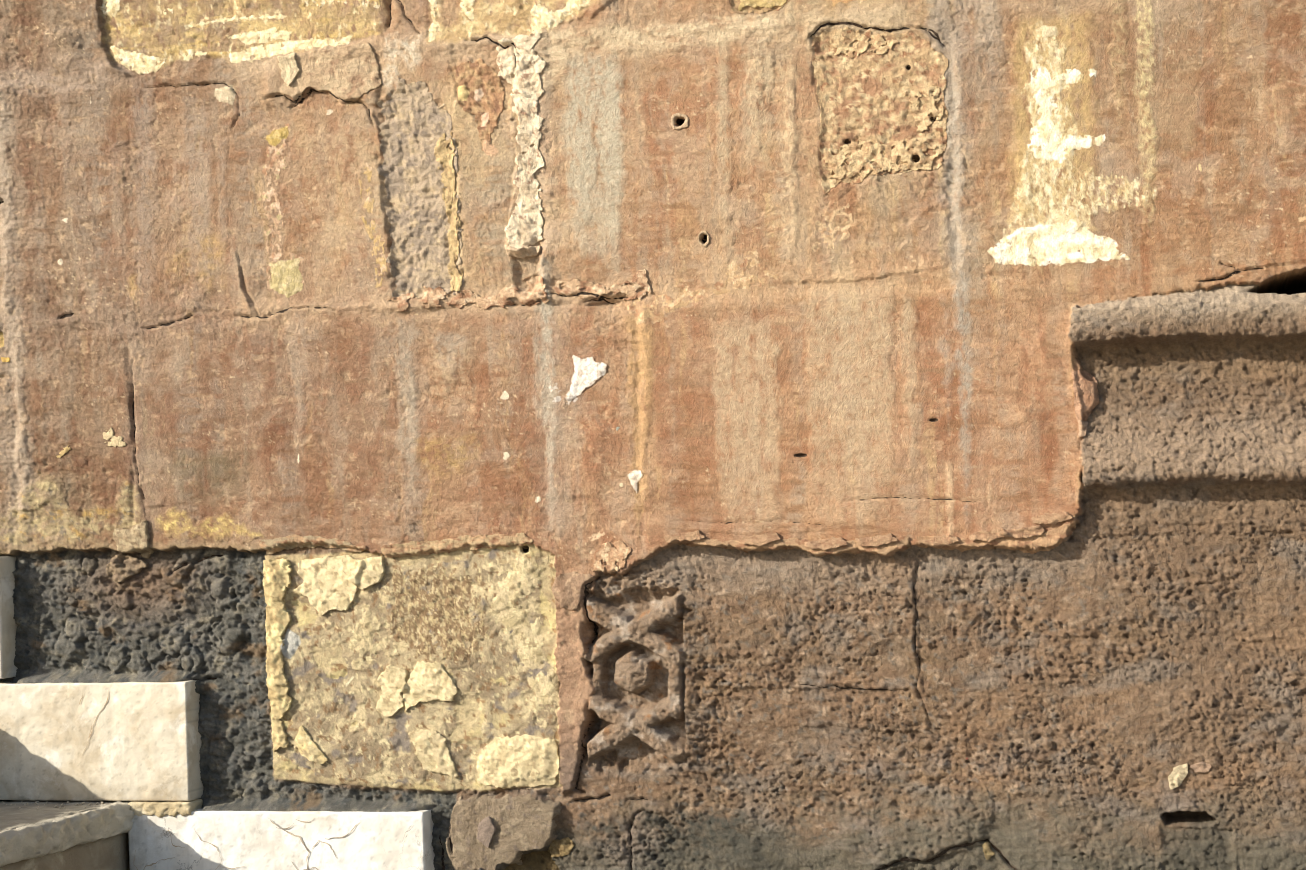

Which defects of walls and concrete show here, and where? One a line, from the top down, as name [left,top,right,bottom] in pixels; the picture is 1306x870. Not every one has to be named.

crack [275,89,372,121]
peeling [97,0,790,325]
peeling [987,18,1178,267]
crack [1199,263,1262,282]
peeling [103,427,126,448]
peeling [0,445,631,870]
crack [133,830,244,870]
crack [271,818,361,870]
crack [877,839,1017,870]